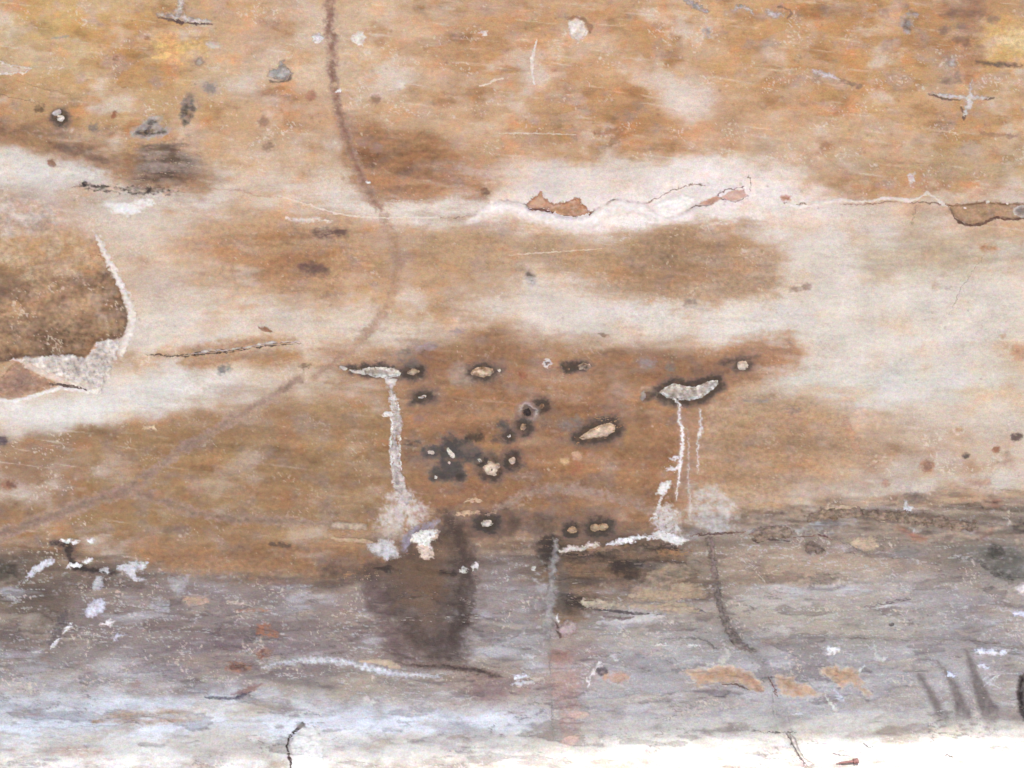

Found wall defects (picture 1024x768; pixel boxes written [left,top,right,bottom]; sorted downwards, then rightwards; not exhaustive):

crack [278,174,752,235]
spalling [526,191,593,217]
crack [779,190,948,226]
spalling [945,199,1024,227]
spalling [0,188,140,405]
crack [145,325,312,378]
rust [0,102,813,542]
damp [0,0,908,687]